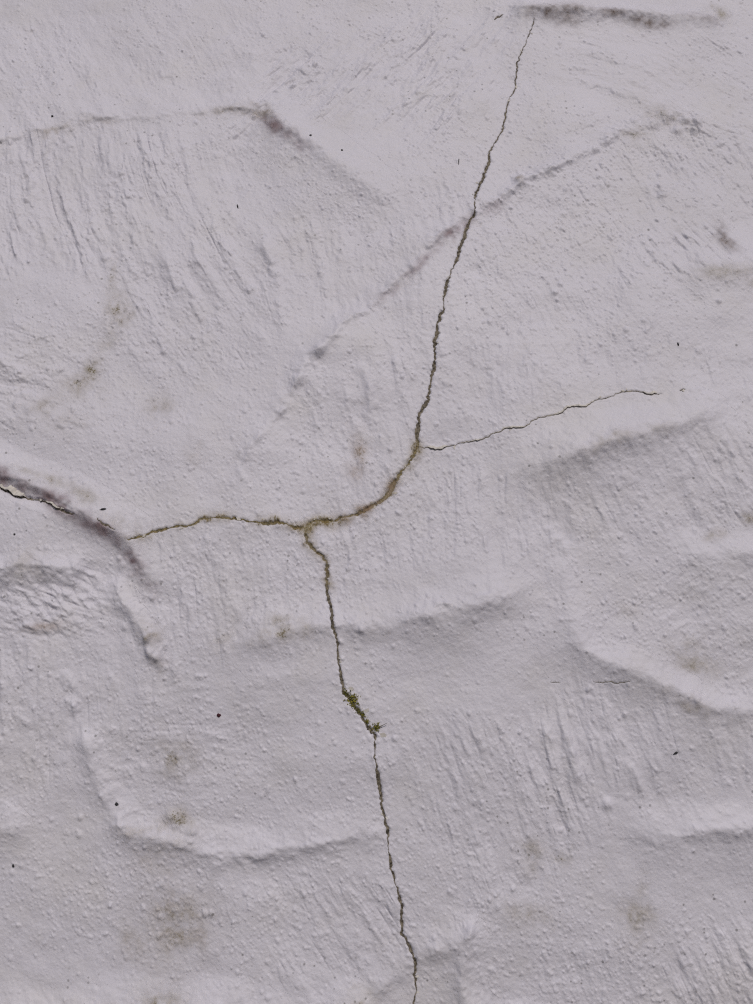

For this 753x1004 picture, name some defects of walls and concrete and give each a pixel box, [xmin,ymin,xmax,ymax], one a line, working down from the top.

crack [0,484,74,515]
crack [97,21,659,1004]